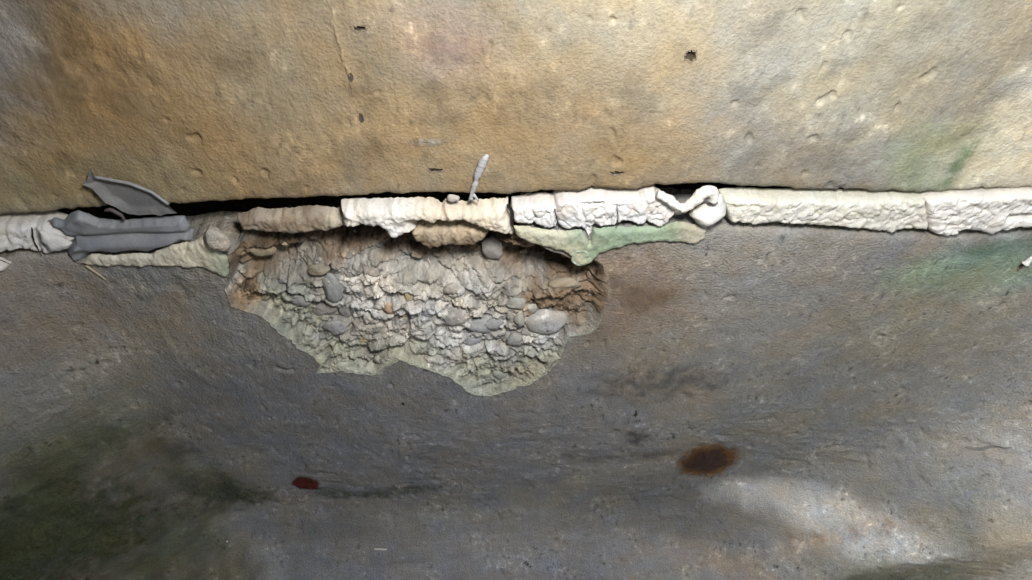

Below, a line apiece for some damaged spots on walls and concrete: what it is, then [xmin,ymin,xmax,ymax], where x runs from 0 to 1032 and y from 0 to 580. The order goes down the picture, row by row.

spalling [225,219,609,397]
corrosion [680,445,738,476]
corrosion [293,477,319,490]